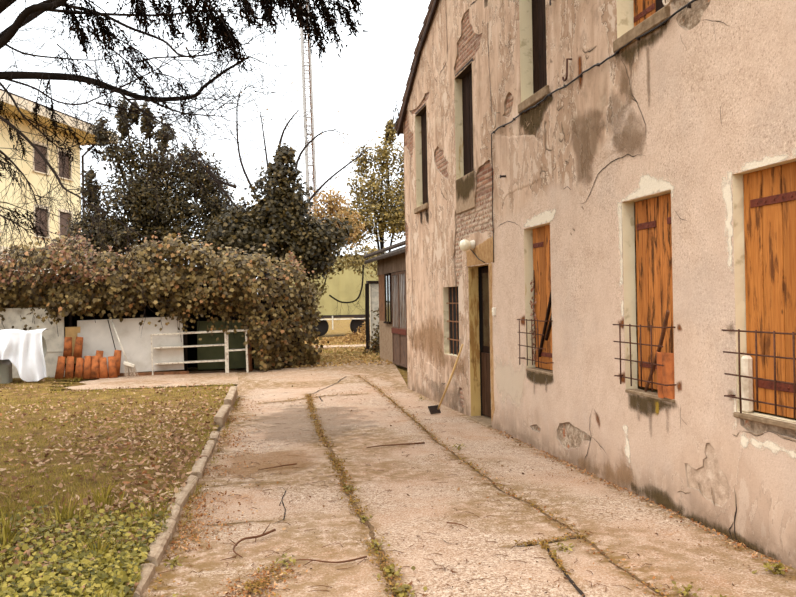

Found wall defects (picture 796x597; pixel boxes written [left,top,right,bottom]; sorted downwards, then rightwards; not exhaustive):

flaking render [454,9,482,76]
flaking render [434,146,449,199]
peeling [453,110,569,287]
damp [572,114,599,180]
crack [579,55,646,204]
peeling [732,355,796,442]
flaking render [557,422,592,450]
flaking render [678,443,730,508]